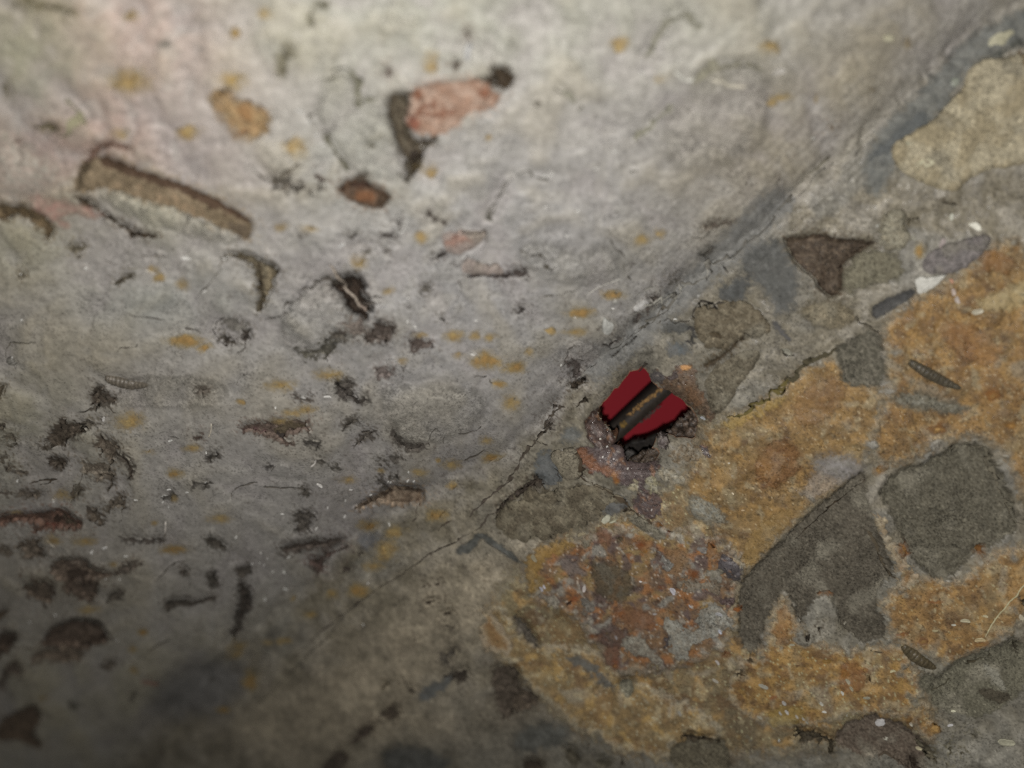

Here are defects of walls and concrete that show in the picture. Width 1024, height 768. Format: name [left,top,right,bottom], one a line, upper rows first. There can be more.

crack [256,406,652,706]
corrosion [120,93,1024,768]
spalling [565,359,616,448]